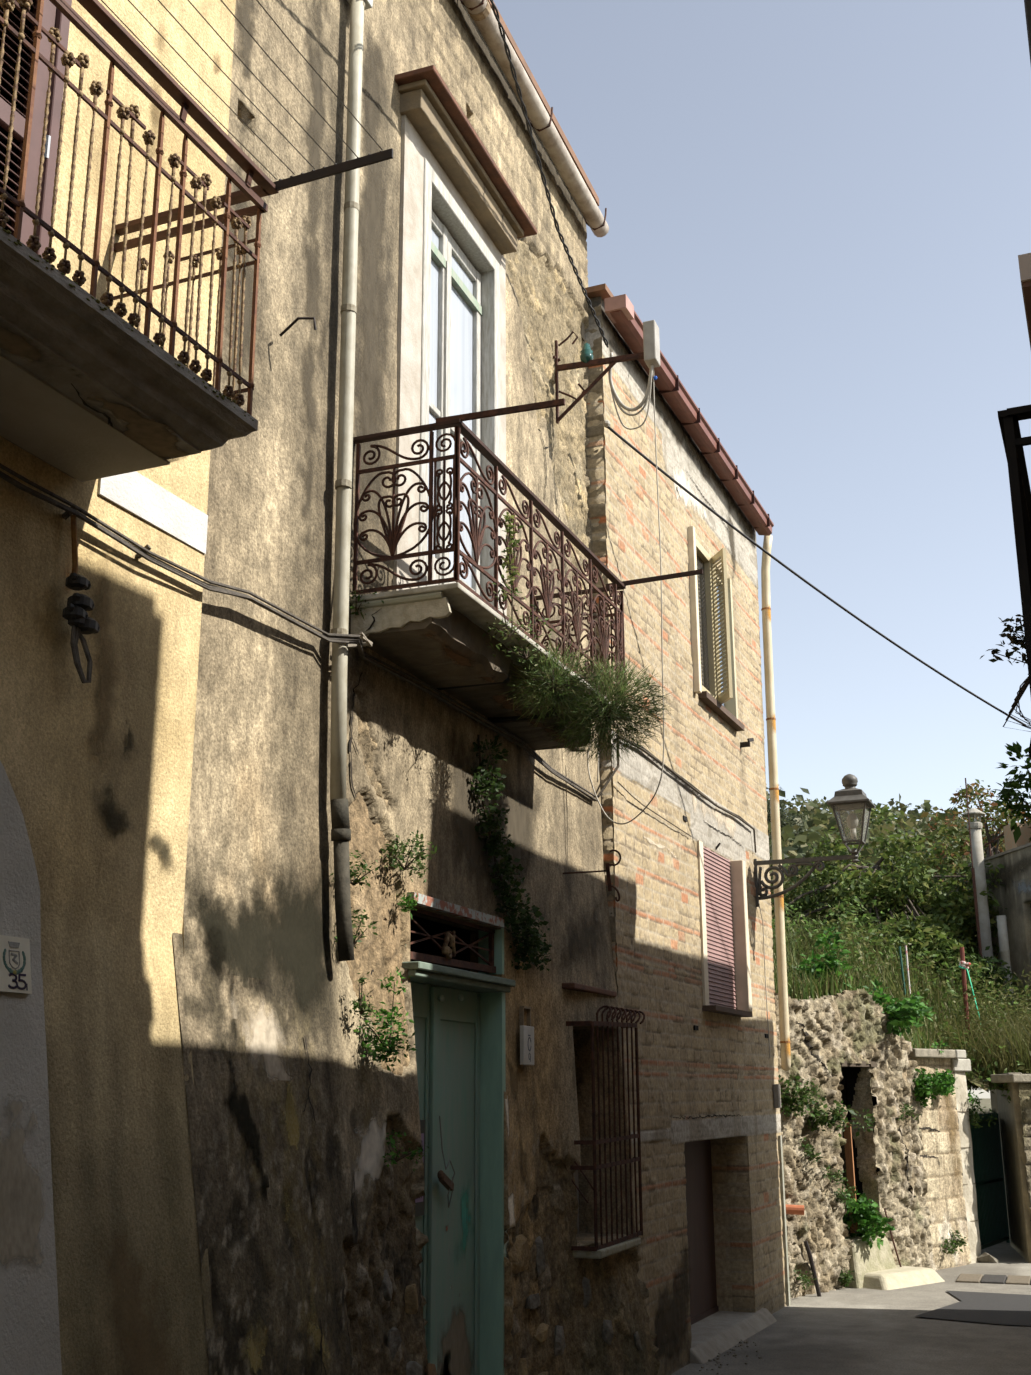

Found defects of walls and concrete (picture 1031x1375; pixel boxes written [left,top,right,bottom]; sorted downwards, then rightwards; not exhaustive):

damp [90,578,134,757]
damp [100,789,129,835]
damp [151,834,172,866]
peeling [425,1308,471,1375]